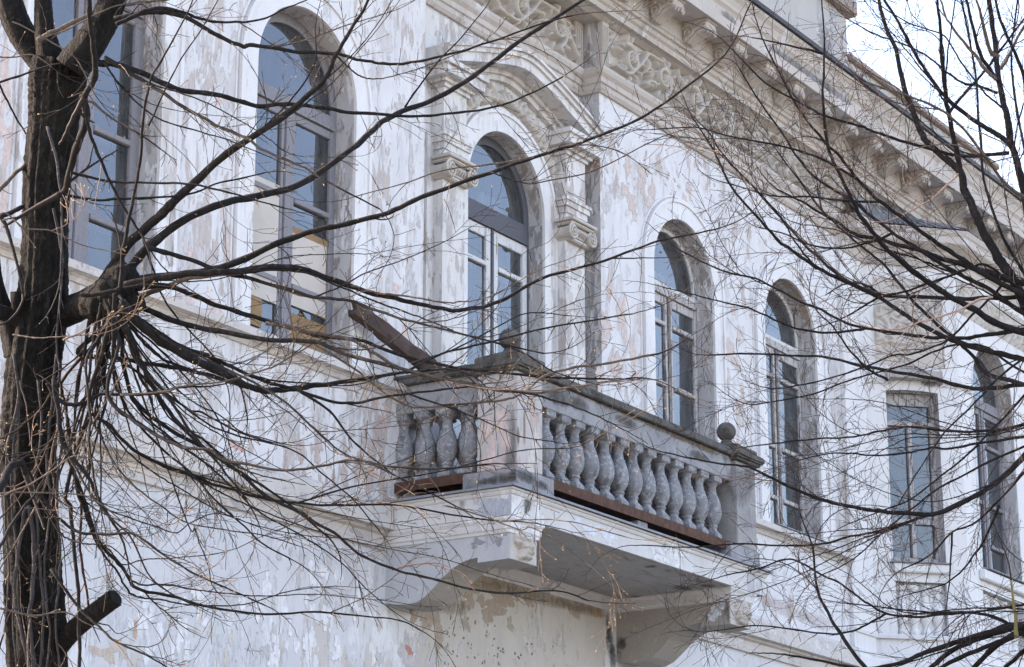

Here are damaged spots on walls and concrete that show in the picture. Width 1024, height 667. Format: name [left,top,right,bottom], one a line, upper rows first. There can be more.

flaking render [0,37,13,168]
flaking render [0,185,9,232]
flaking render [588,133,700,229]
peeling [90,545,383,667]
flaking render [397,581,534,667]
spalling [569,602,605,619]